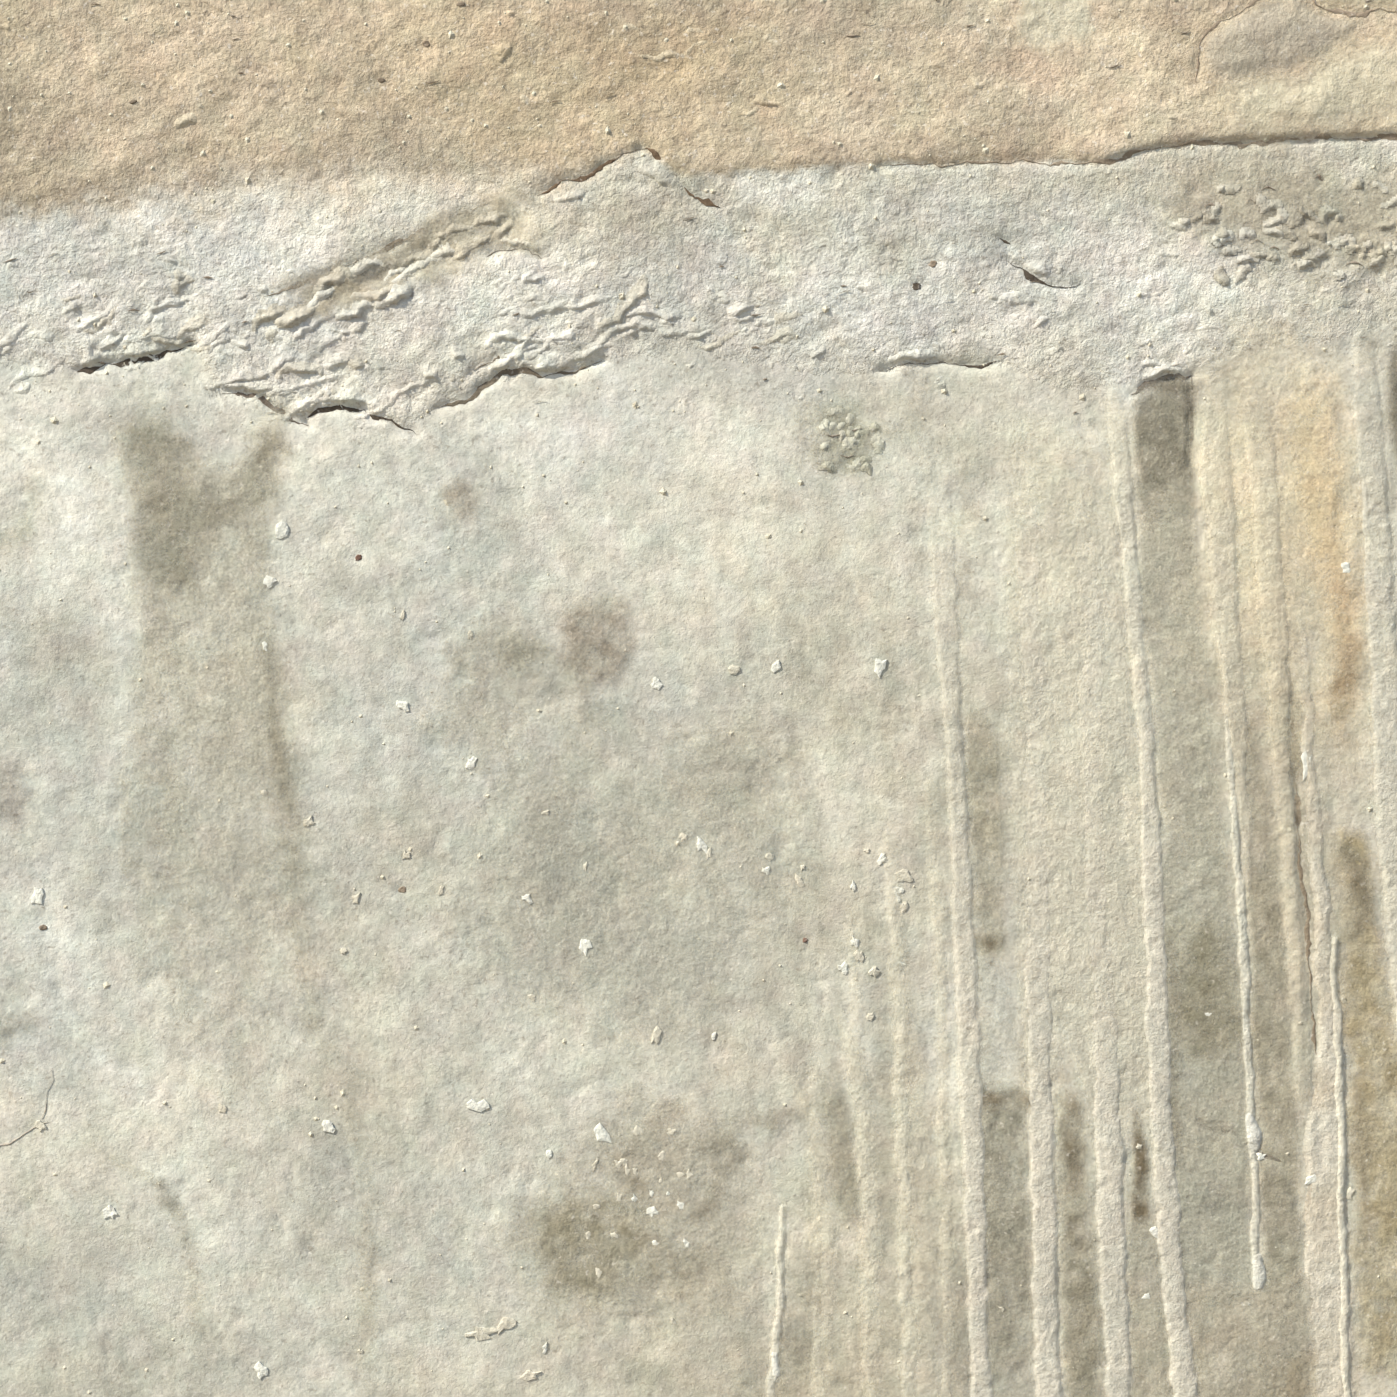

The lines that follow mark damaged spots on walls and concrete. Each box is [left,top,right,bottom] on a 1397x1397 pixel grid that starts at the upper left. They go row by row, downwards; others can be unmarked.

flaking render [174,104,203,129]
flaking render [603,28,707,77]
crack [1195,0,1259,81]
crack [1313,0,1394,17]
peeling [0,192,856,429]
peeling [987,280,1056,344]
spalling [1167,170,1397,305]
water stain [123,421,305,935]
water stain [1130,378,1316,1397]
water stain [506,1094,758,1318]
water stain [982,1073,1031,1397]
water stain [1337,831,1397,1375]